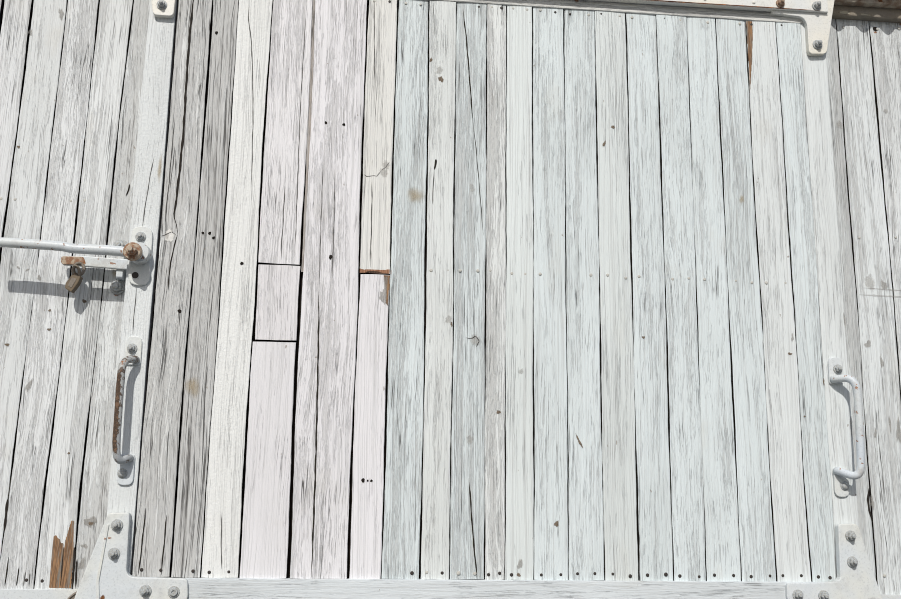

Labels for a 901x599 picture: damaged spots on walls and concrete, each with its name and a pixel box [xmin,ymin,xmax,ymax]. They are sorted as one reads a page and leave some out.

crack [469,484,477,575]